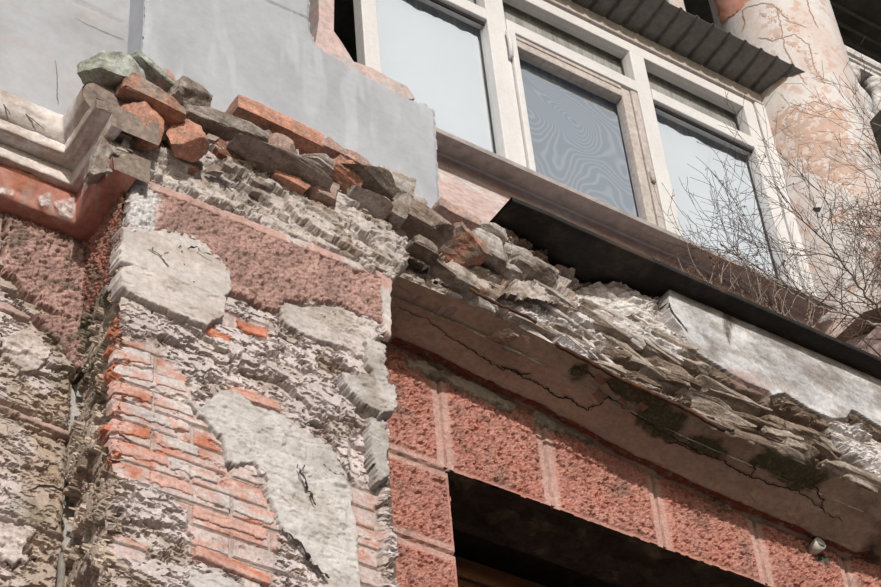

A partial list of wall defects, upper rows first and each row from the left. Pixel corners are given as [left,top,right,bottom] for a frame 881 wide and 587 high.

peeling [713,0,749,25]
peeling [0,212,88,385]
peeling [104,144,881,587]
crack [399,307,843,522]
crack [633,289,688,332]
peeling [0,522,36,569]